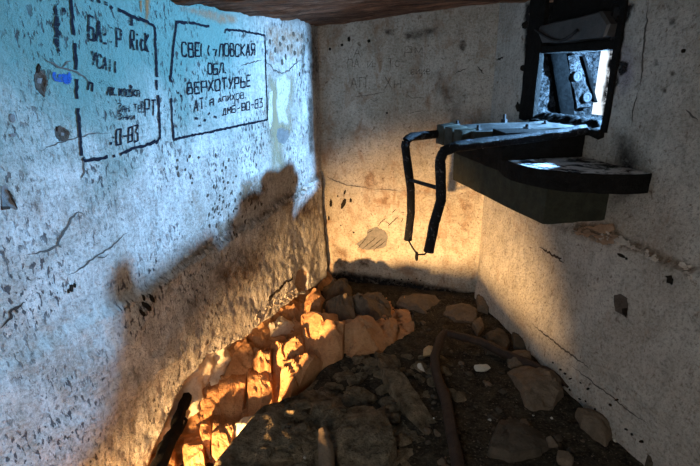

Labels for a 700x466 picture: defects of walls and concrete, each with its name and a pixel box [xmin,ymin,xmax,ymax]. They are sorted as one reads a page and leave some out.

spalling [34,63,48,97]
crack [632,0,649,121]
spalling [0,185,18,210]
crack [28,212,85,255]
crack [69,233,127,275]
peeling [573,223,696,280]
crack [1,302,25,328]
spalling [614,294,628,318]
crack [536,327,648,424]